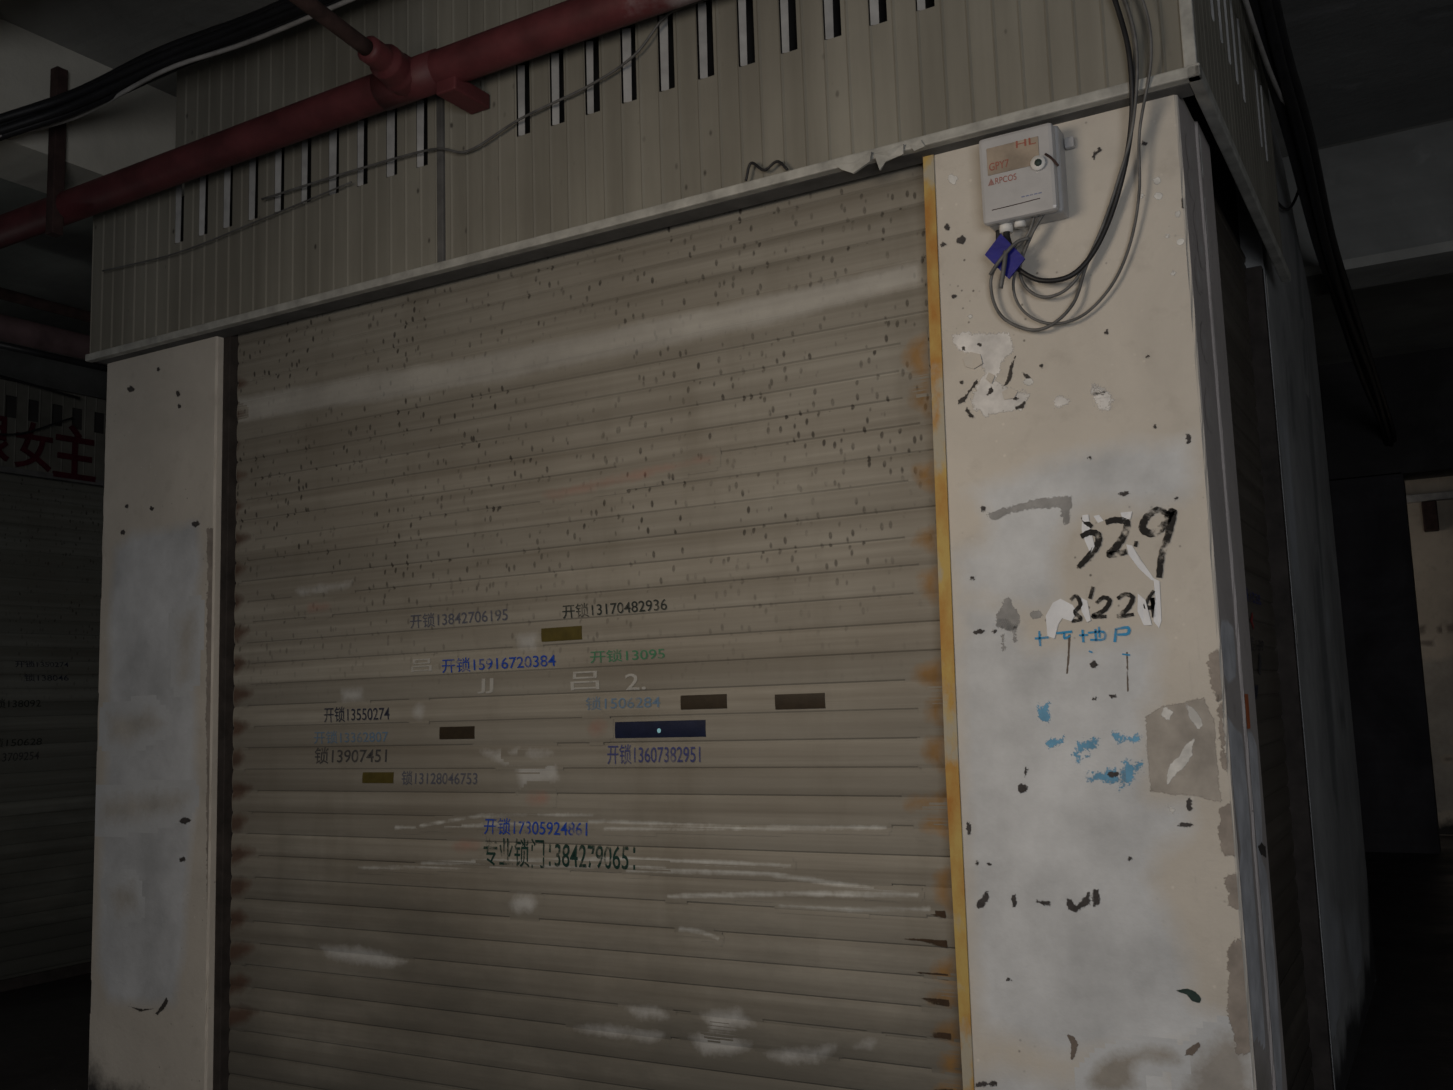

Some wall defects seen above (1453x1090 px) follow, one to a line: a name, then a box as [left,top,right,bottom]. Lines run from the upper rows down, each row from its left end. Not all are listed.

spalling [940,224,966,247]
spalling [952,315,1043,418]
leakage [986,496,1072,524]
leakage [996,597,1042,650]
leakage [1074,1016,1272,1090]